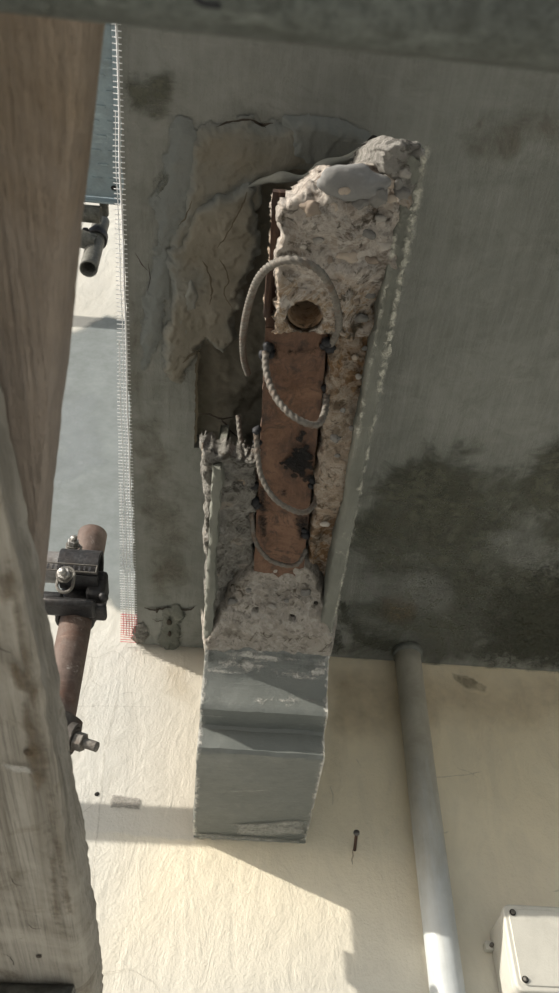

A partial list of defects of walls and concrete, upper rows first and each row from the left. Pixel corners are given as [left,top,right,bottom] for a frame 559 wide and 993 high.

spalling [131,604,186,650]
spalling [193,135,430,843]
water stain [332,440,559,667]